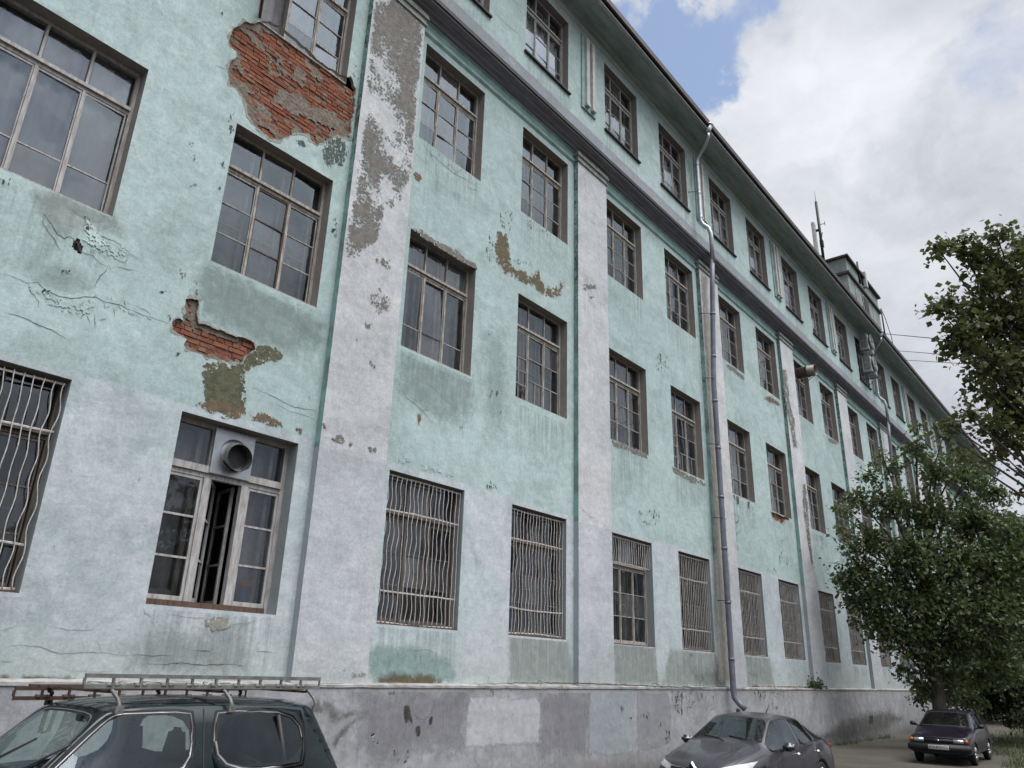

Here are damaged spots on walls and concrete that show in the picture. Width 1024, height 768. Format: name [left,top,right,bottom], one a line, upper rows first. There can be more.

flaking render [226,0,423,269]
crack [4,208,167,336]
flaking render [169,269,283,427]
peeling [365,288,390,328]
peeling [486,212,566,298]